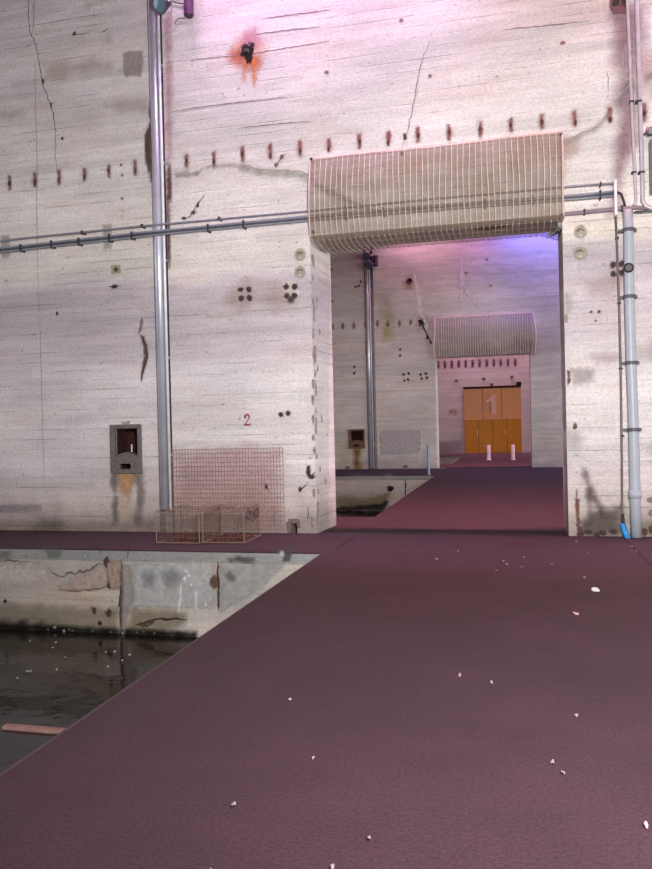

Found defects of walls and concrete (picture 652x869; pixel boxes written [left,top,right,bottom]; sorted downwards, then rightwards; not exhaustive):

crack [28,2,58,214]
corrosion [233,42,256,79]
crack [400,42,430,156]
crack [38,336,46,464]
corrosion [111,474,142,522]
peeling [0,557,132,635]
water stain [0,569,207,638]